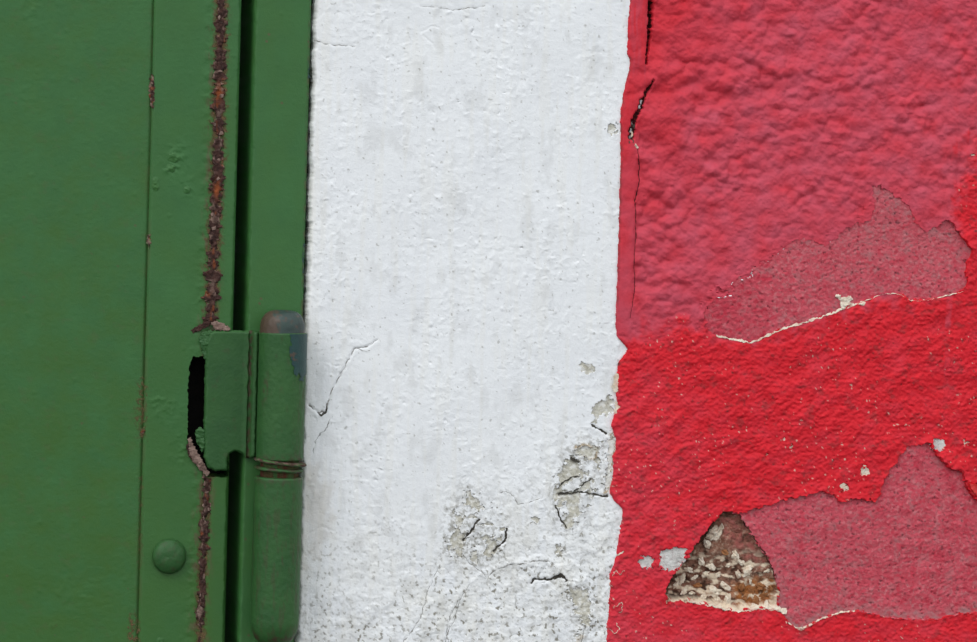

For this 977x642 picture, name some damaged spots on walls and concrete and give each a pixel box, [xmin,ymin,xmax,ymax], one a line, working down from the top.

corrosion [201,0,229,323]
crack [628,0,654,316]
peeling [703,185,971,343]
corrosion [186,437,212,642]
crack [309,346,370,450]
spalling [443,490,508,565]
spalling [552,373,620,530]
peeling [665,439,977,631]